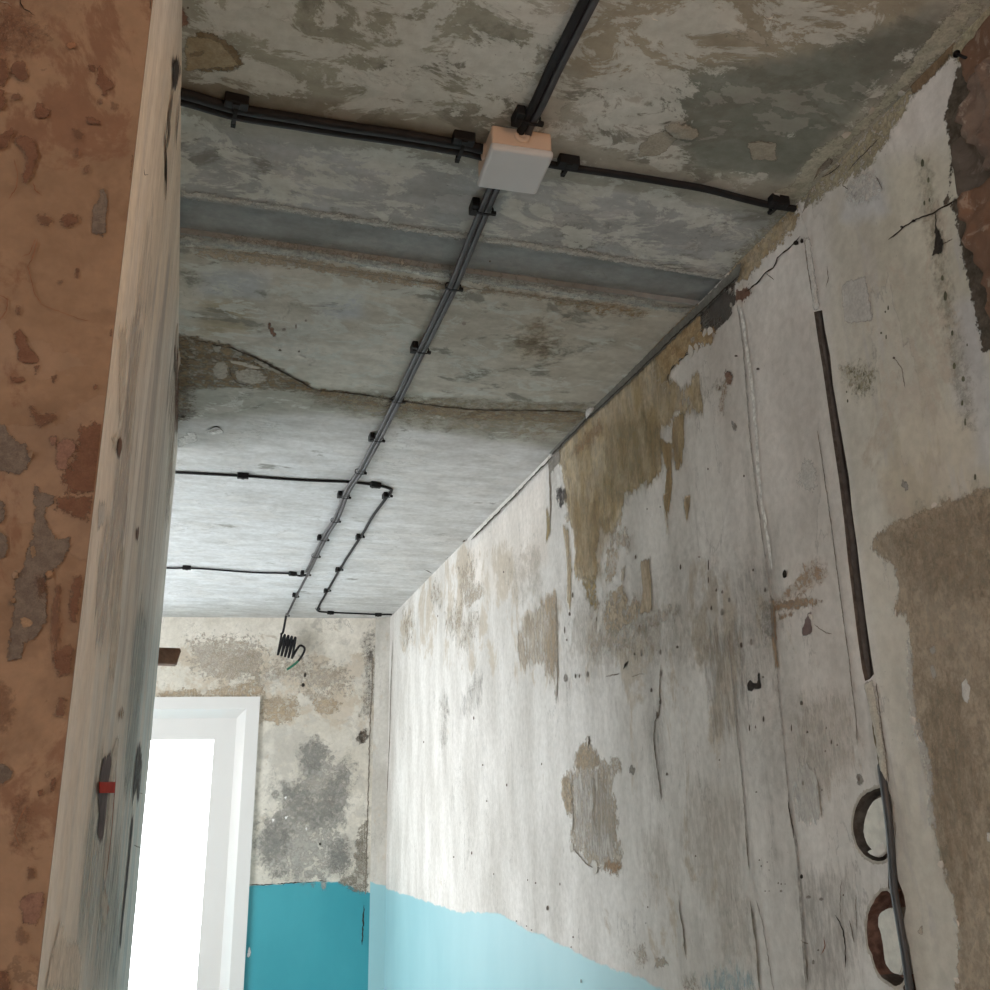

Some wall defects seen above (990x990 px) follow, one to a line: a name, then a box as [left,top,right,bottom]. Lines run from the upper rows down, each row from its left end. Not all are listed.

peeling [0,424,33,475]
peeling [10,329,39,383]
flaking render [165,323,334,526]
spalling [180,235,716,383]
crack [316,239,803,558]
peeling [180,1,990,307]
crack [888,200,956,256]
peeling [7,421,101,677]
flaking render [97,738,119,930]
leakage [254,735,357,889]
peeling [561,736,624,875]
peeling [872,474,990,990]